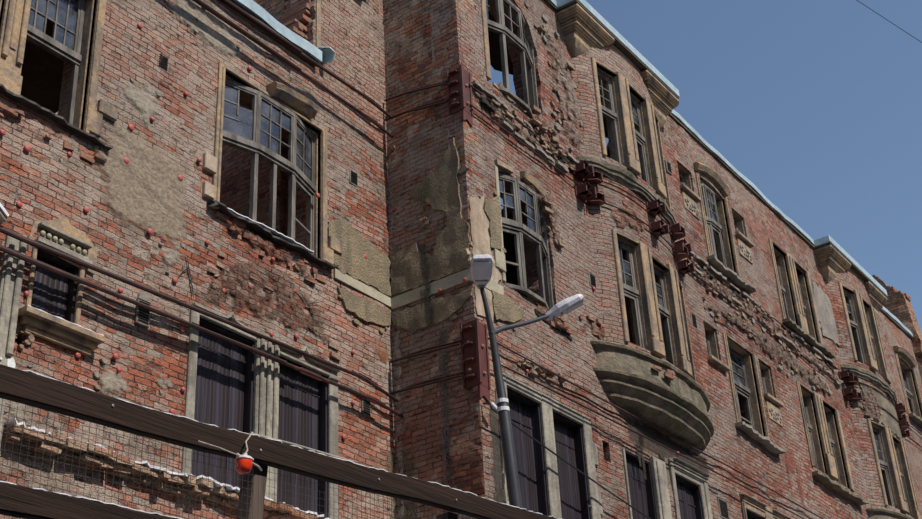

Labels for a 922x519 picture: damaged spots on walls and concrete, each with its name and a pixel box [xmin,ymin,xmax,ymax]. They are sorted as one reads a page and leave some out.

spalling [469,82,579,169]
spalling [215,211,326,284]
peeling [327,137,573,341]
spalling [578,315,605,339]